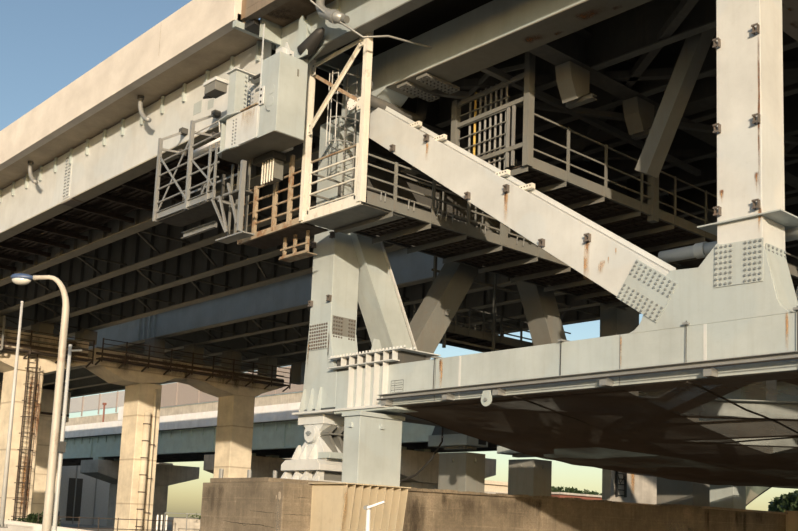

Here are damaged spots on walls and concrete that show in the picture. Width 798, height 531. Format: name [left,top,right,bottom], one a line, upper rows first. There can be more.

corrosion [28,380,41,432]